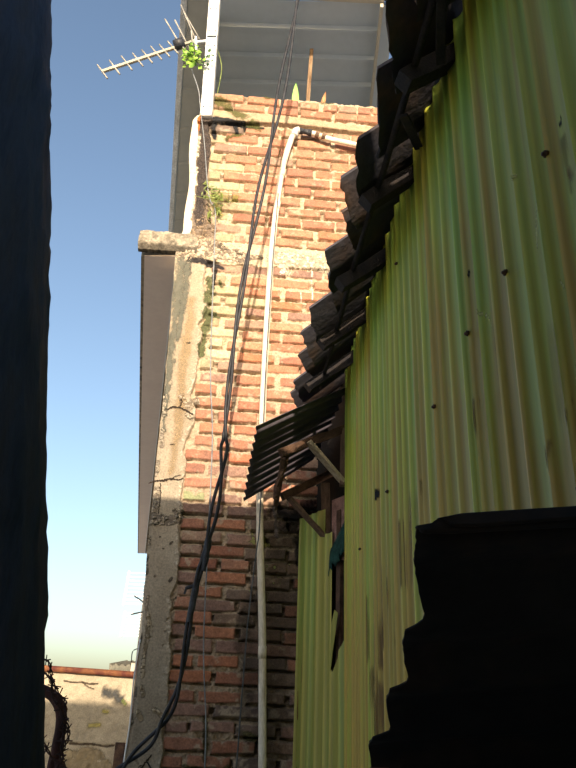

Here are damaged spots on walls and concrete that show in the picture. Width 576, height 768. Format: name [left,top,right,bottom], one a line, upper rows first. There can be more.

crack [163,386,193,415]
crack [148,475,183,514]